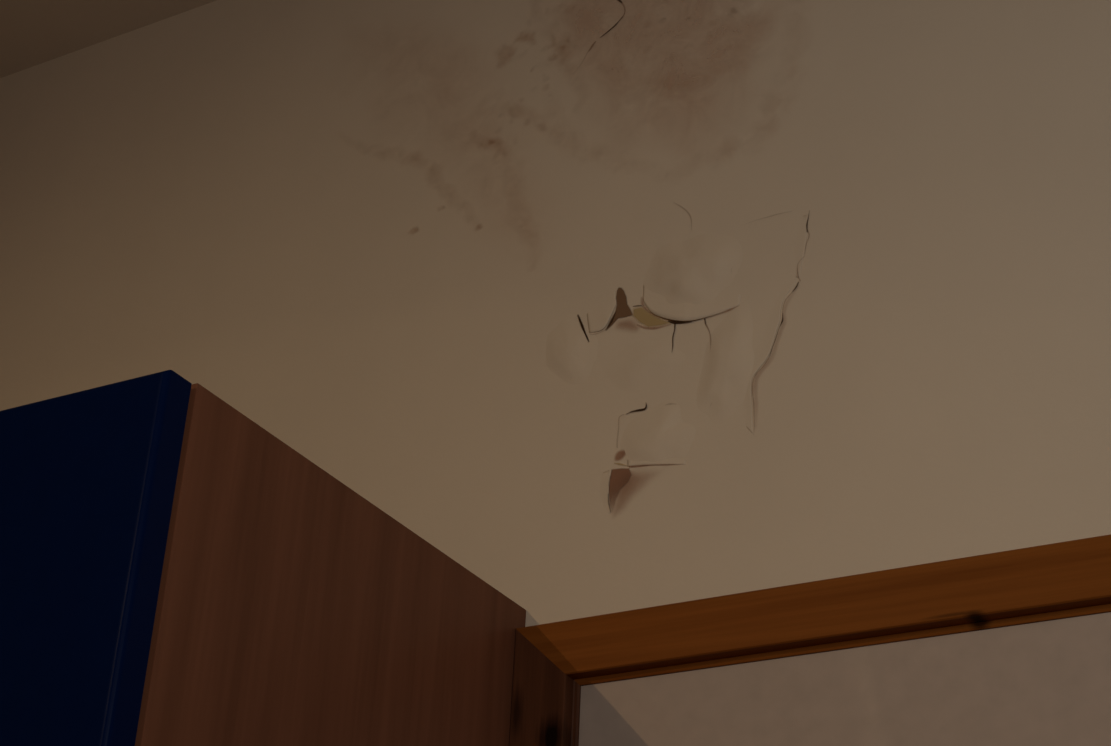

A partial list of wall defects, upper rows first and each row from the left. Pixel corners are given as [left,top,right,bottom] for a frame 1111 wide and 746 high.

peeling [587,284,741,333]
peeling [600,451,686,514]